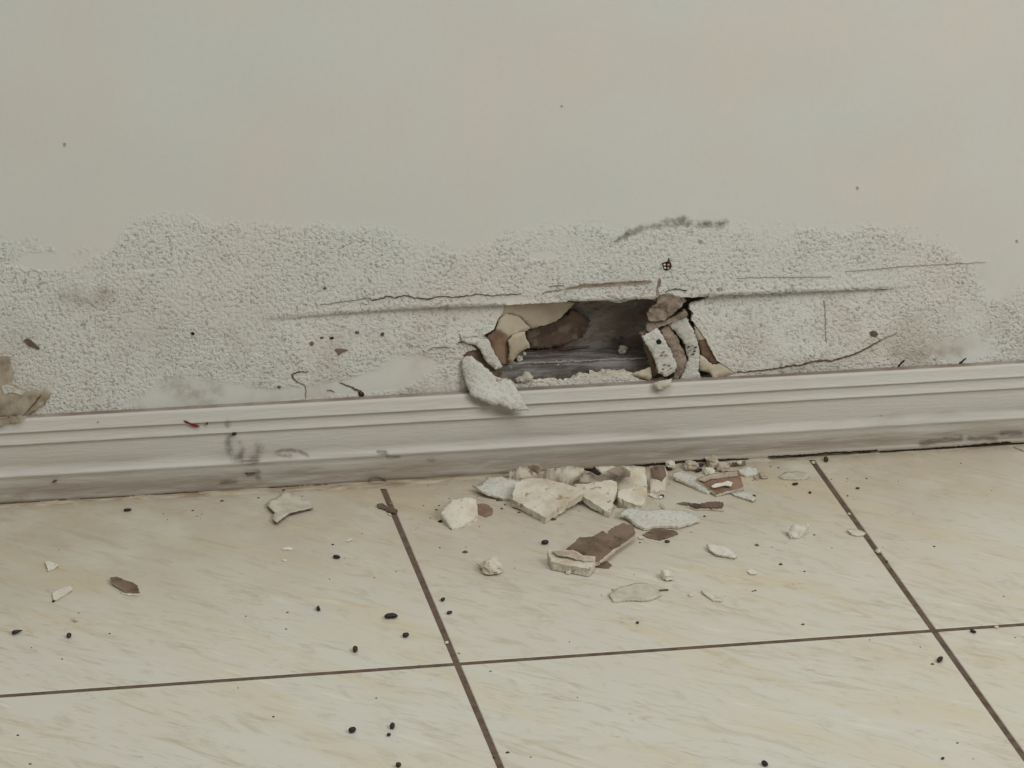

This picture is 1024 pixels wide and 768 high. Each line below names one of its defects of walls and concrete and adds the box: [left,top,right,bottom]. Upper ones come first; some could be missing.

crack [320,289,563,305]
spalling [460,280,736,411]
crack [713,262,985,373]